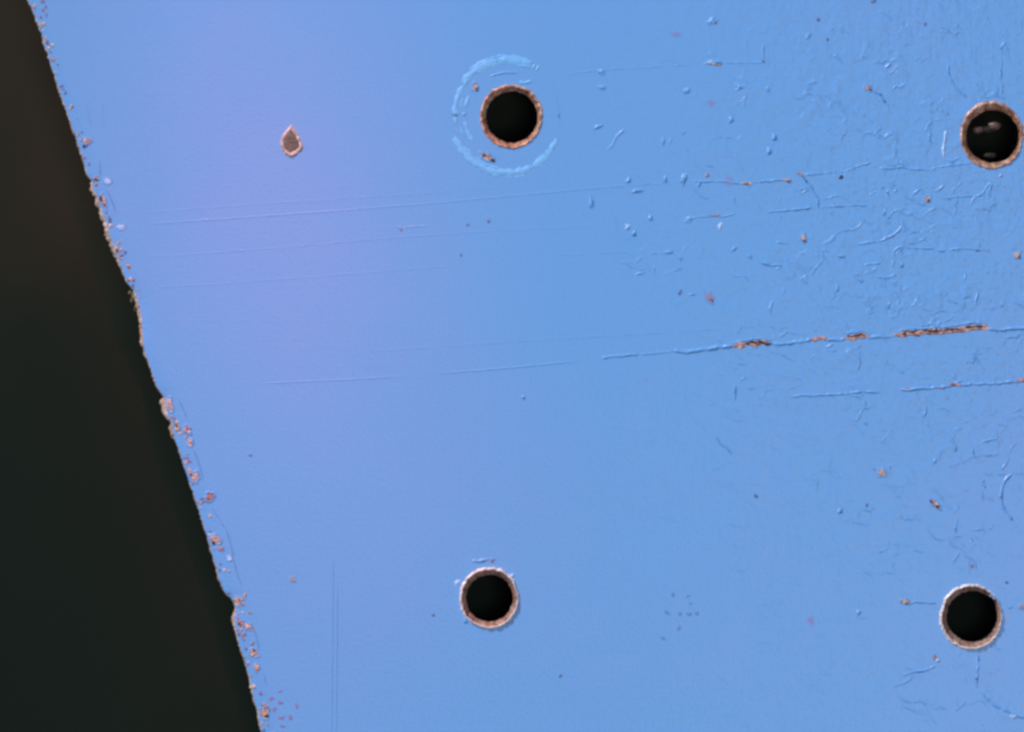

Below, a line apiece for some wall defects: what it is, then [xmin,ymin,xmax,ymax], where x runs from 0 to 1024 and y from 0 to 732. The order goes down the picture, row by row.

peeling [32,3,59,74]
peeling [76,132,140,298]
crack [692,160,961,213]
crack [426,321,1024,375]
crack [790,378,1024,398]
peeling [166,395,233,572]
peeling [227,591,270,732]
crack [955,647,1024,719]